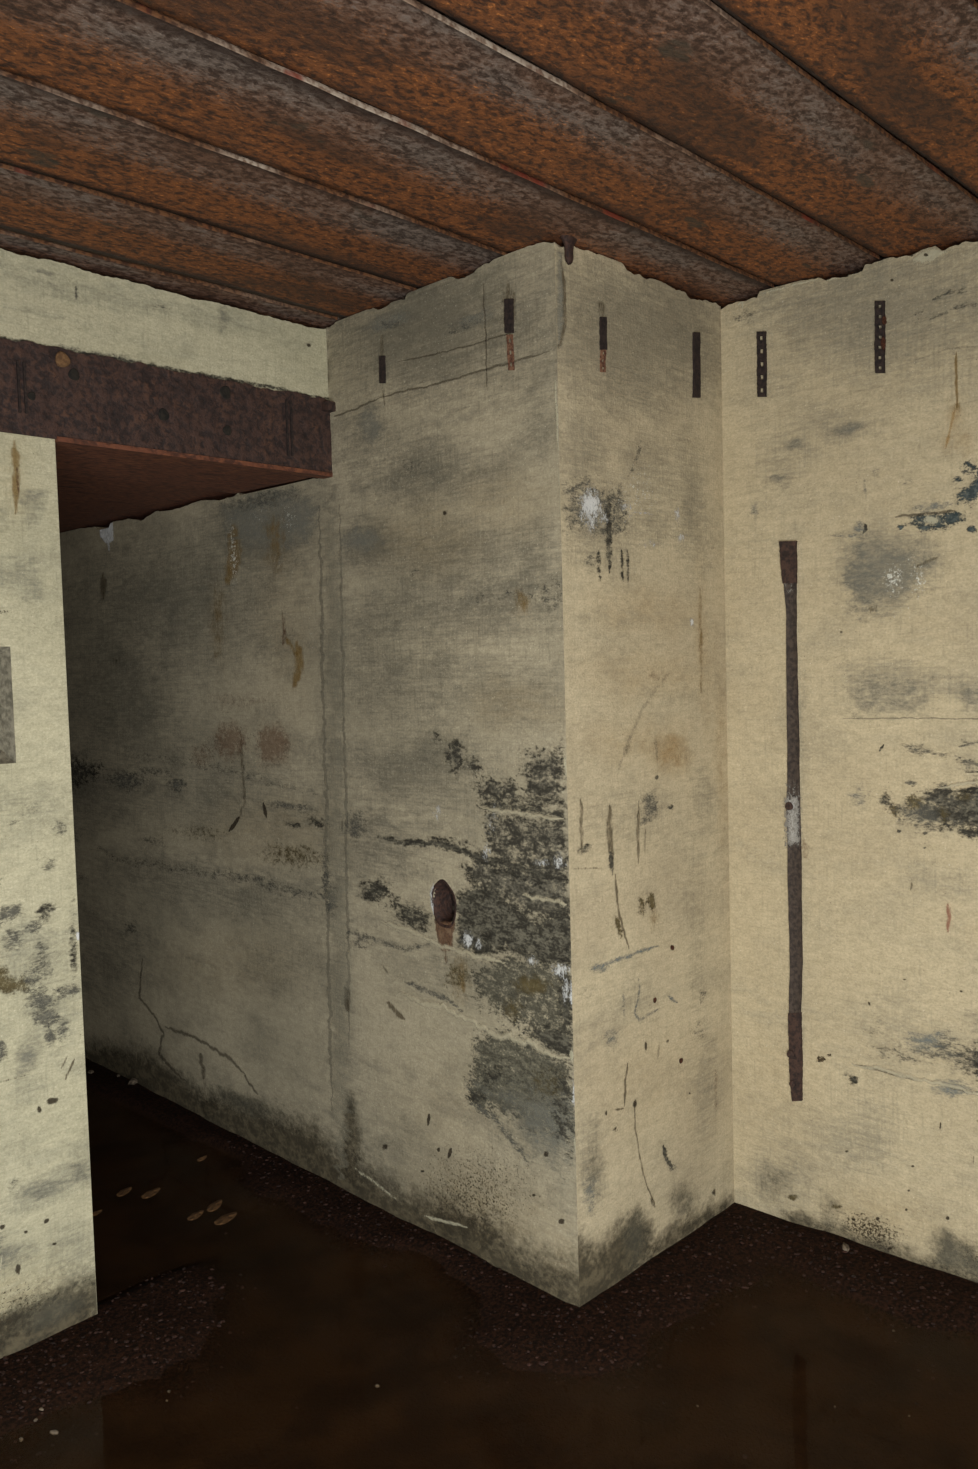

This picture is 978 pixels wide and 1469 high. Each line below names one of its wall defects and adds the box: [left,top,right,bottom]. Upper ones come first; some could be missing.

corrosion [560,235,577,265]
damp [564,476,650,581]
damp [857,549,937,619]
damp [881,741,978,849]
damp [0,904,79,1042]
corrosion [435,920,455,961]
damp [0,1040,34,1062]
crack [139,958,257,1093]
damp [71,732,729,1308]
damp [879,1032,978,1097]
damp [788,1214,978,1283]